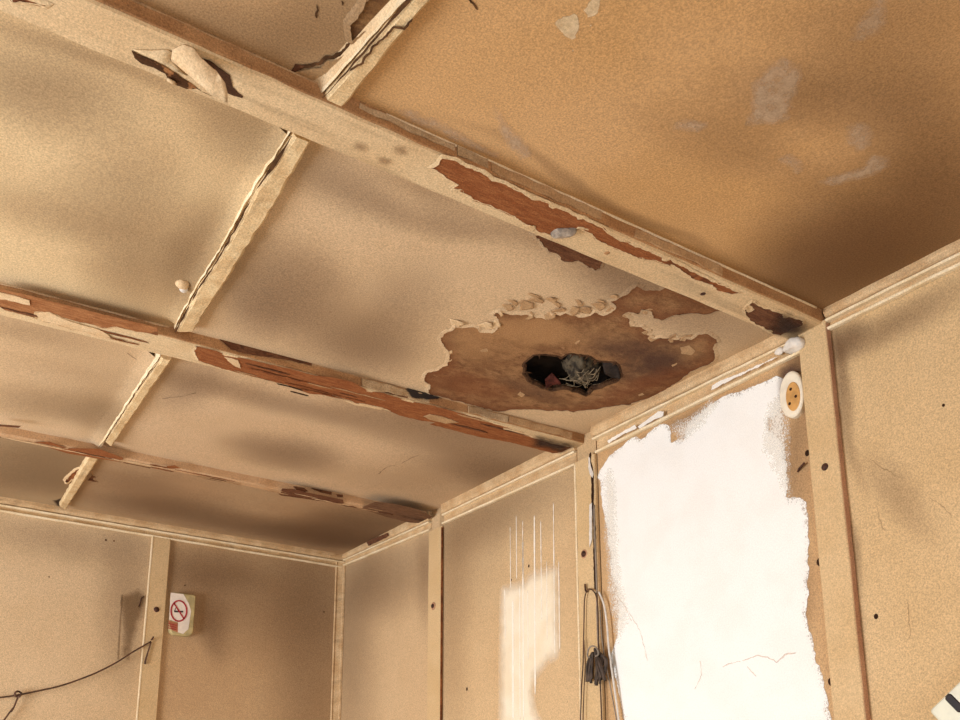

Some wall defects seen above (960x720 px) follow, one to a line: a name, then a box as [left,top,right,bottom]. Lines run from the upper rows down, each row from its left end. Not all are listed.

peeling [343,0,390,45]
crack [175,136,292,332]
peeling [427,154,806,336]
peeling [192,283,722,453]
peeling [32,441,152,484]
peeling [279,486,345,504]
peeling [360,502,432,523]